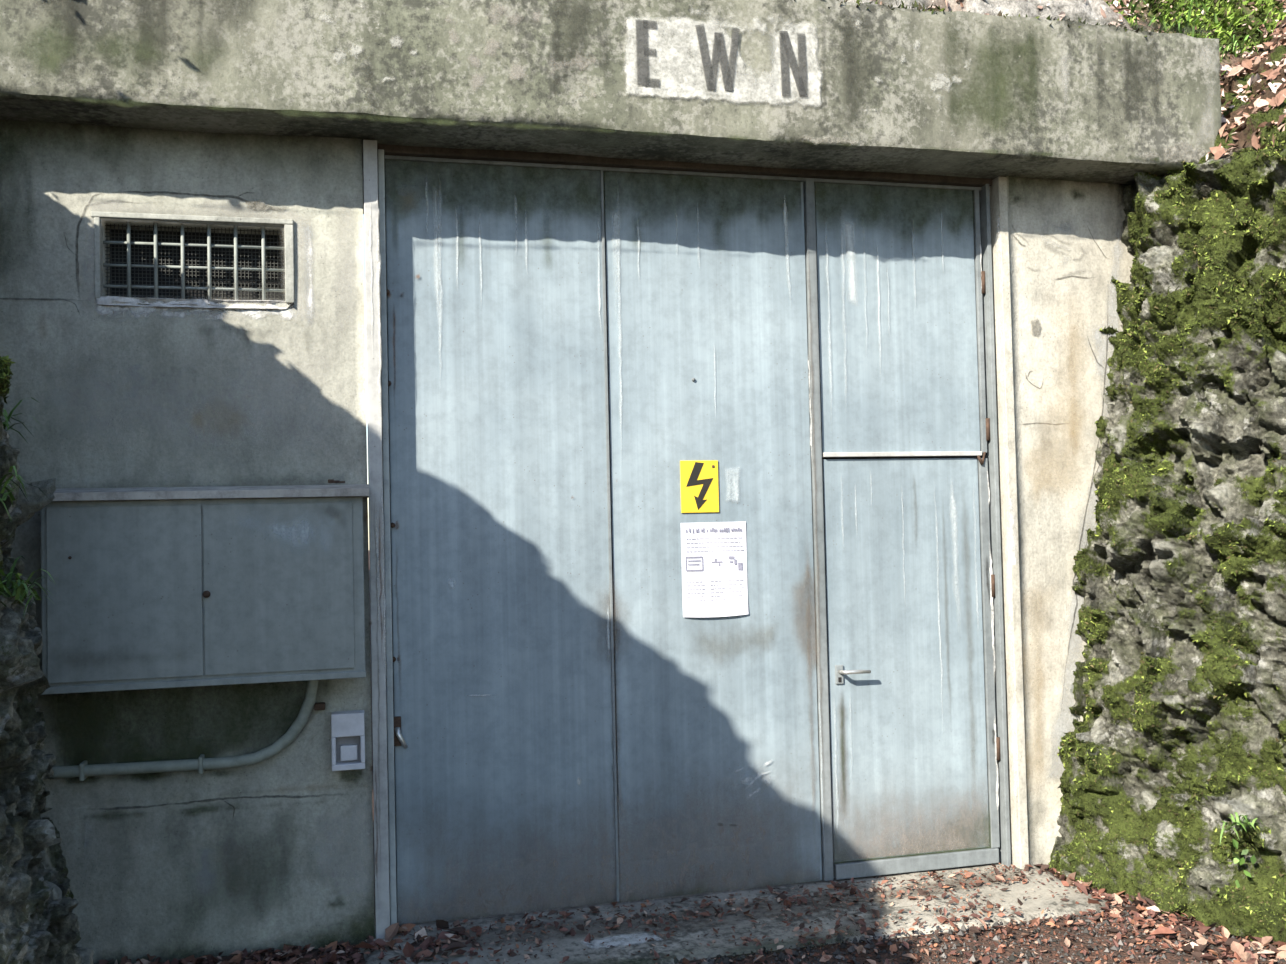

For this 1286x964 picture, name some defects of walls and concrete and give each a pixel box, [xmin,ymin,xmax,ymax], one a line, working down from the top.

crack [5,191,254,304]
crack [115,796,300,816]
water stain [313,912,375,950]